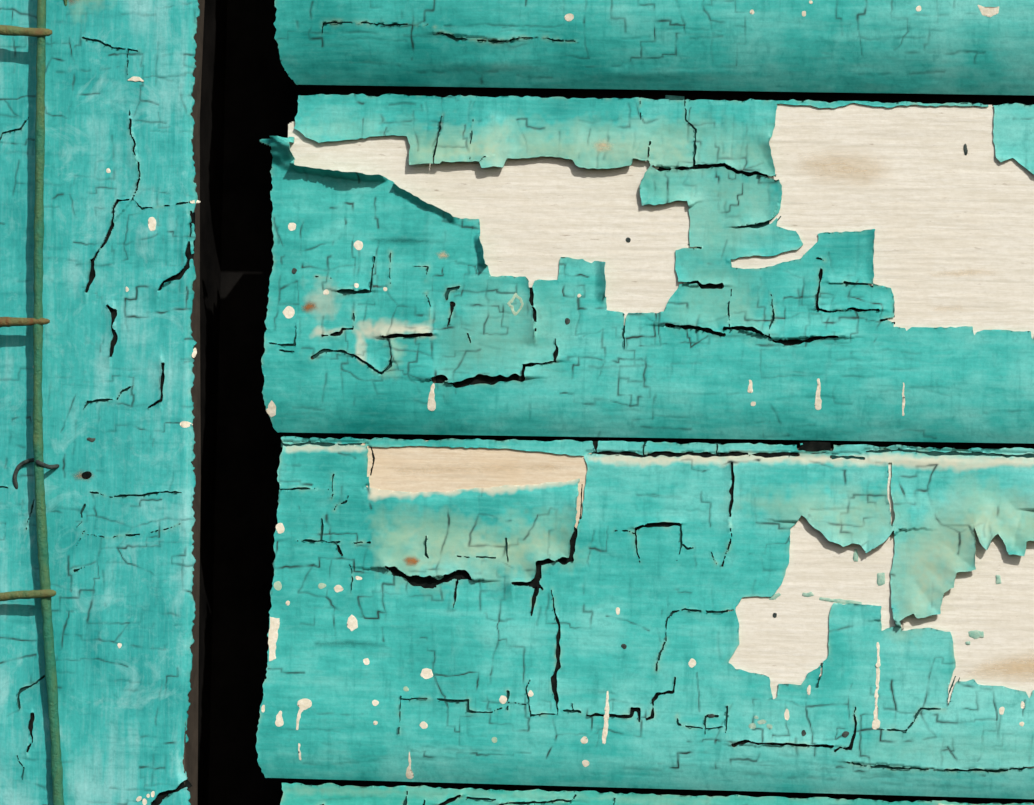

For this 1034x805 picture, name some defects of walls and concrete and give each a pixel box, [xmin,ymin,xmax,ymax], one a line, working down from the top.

crack [84,37,138,68]
crack [322,22,408,33]
crack [438,33,575,43]
crack [85,112,195,293]
peeling [260,98,1034,383]
crack [107,306,118,357]
crack [84,386,131,408]
crack [148,364,165,408]
peeling [361,443,592,529]
peeling [376,531,468,583]
peeling [728,463,1034,704]
crack [387,484,1027,773]